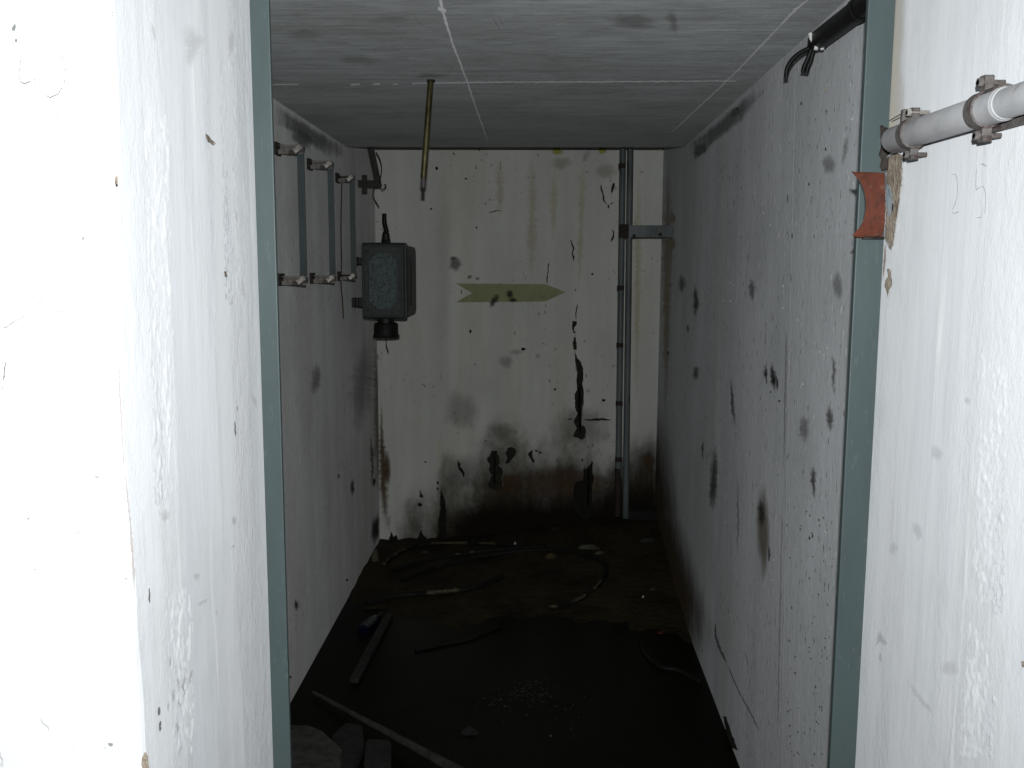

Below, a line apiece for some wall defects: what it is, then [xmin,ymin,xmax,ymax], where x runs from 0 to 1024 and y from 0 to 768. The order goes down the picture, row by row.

flaking render [879,125,903,250]
rust [375,372,390,508]
peeling [485,440,541,490]
leakage [405,451,656,538]
peeling [572,321,586,441]
leakage [702,446,717,497]